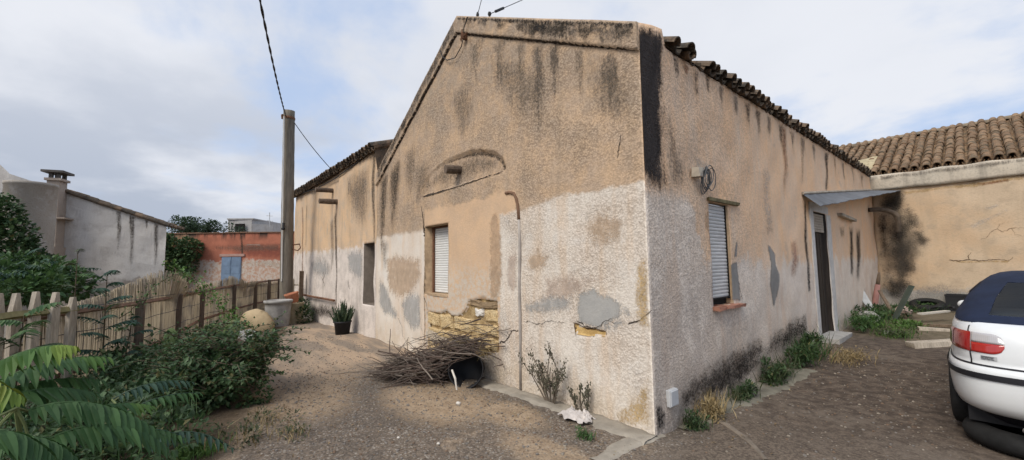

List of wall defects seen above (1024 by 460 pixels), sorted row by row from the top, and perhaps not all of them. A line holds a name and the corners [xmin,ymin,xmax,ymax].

damp [348,17,667,245]
damp [734,98,828,190]
spalling [427,214,502,357]
crack [498,310,652,344]
spalling [574,322,607,337]
damp [682,316,807,407]
damp [850,232,861,277]
damp [881,192,953,301]
crack [951,223,1021,263]